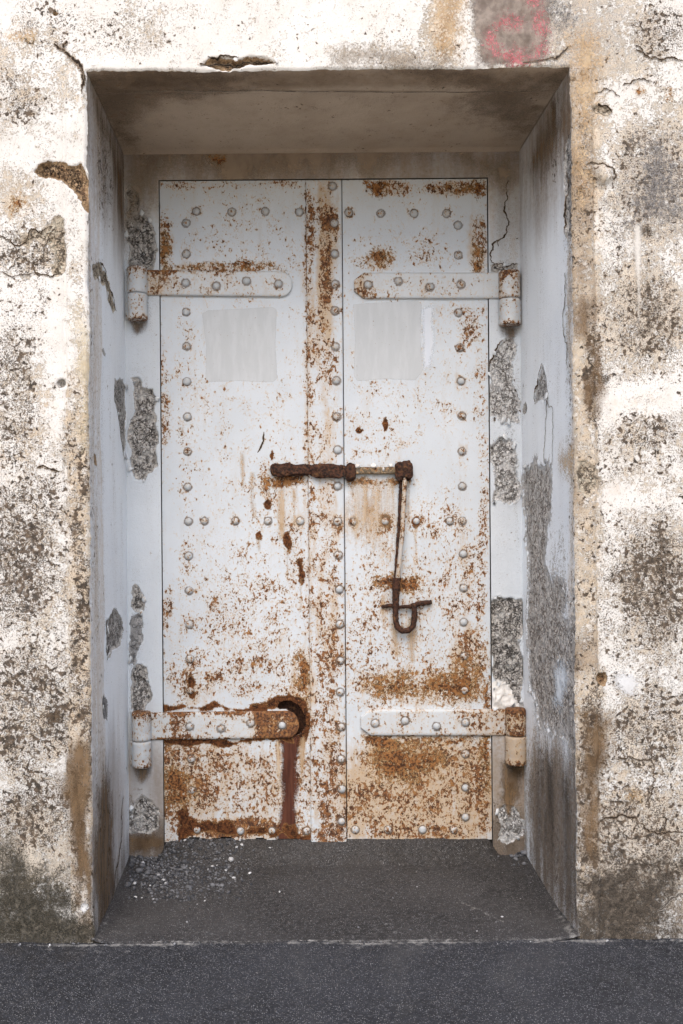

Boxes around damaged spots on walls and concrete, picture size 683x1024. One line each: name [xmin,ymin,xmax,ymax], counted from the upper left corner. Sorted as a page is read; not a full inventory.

spalling [199,54,278,72]
spalling [20,216,67,277]
spalling [34,161,90,213]
crack [489,181,517,269]
spalling [114,377,160,482]
corrosion [282,531,306,585]
corrosion [373,573,423,595]
peeling [487,338,576,759]
spalling [105,584,153,716]
corrosion [357,652,491,709]
corrosion [164,649,311,841]
corrosion [361,734,524,815]